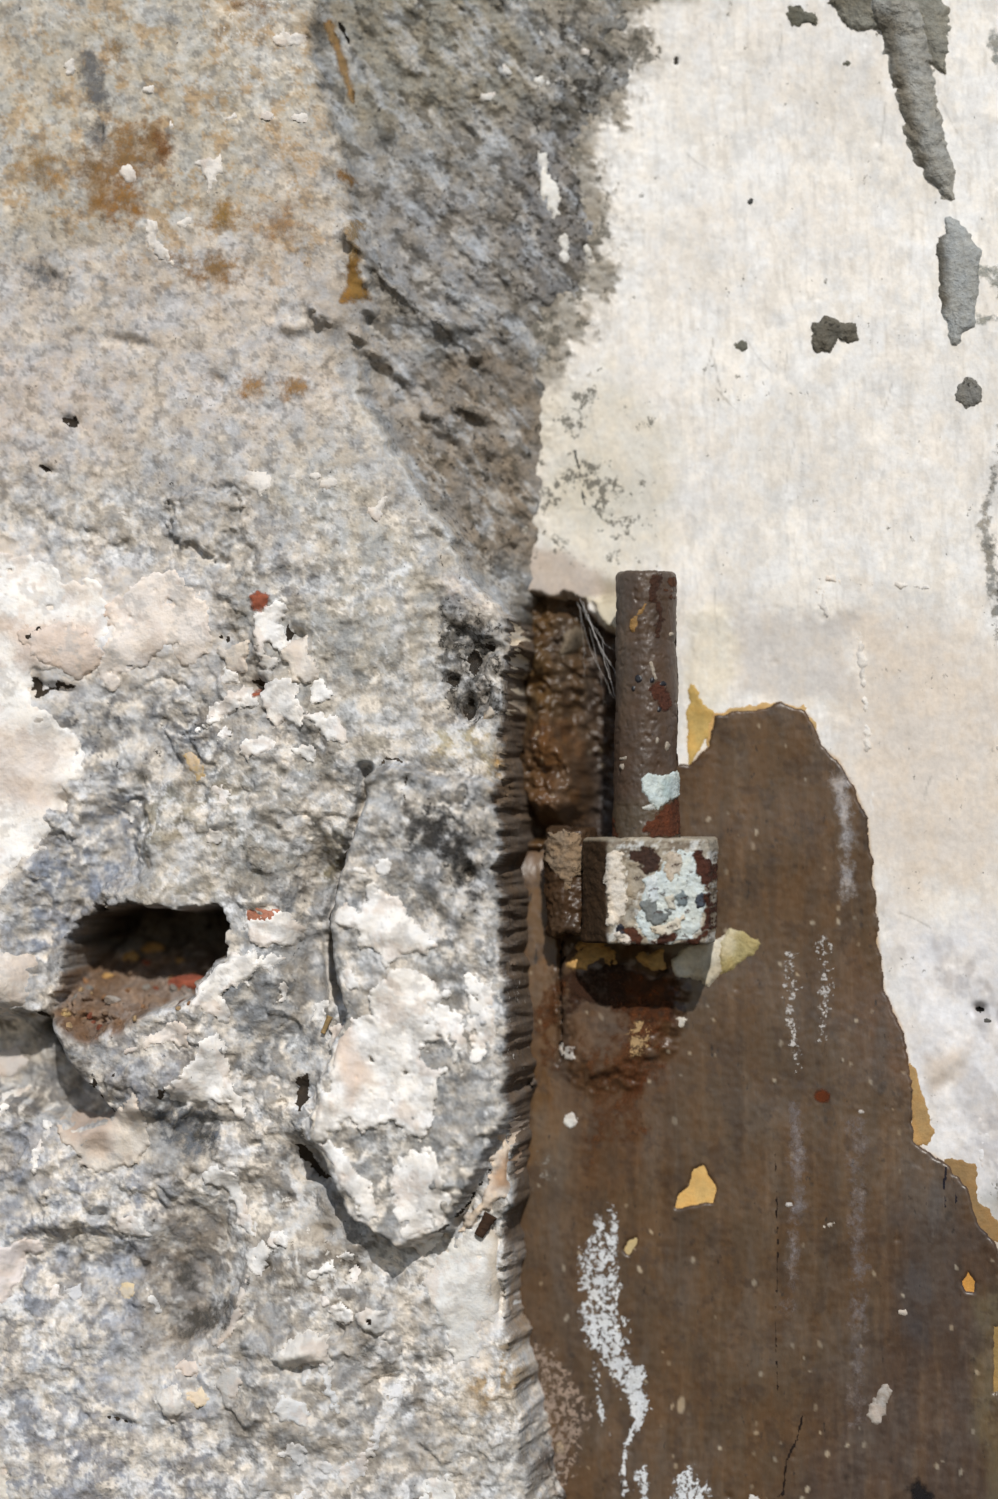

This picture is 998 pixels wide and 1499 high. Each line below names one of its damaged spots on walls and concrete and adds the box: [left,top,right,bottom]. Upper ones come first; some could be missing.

crack [331,21,351,49]
corrosion [648,574,677,638]
corrosion [649,681,672,711]
crack [367,756,408,800]
corrosion [627,798,681,875]
corrosion [624,850,718,945]
peeling [0,1045,32,1118]
peeling [29,1073,150,1175]
peeling [124,908,306,1119]
peeling [300,858,498,1259]
corrosion [536,958,681,1141]
peeling [519,595,998,1499]